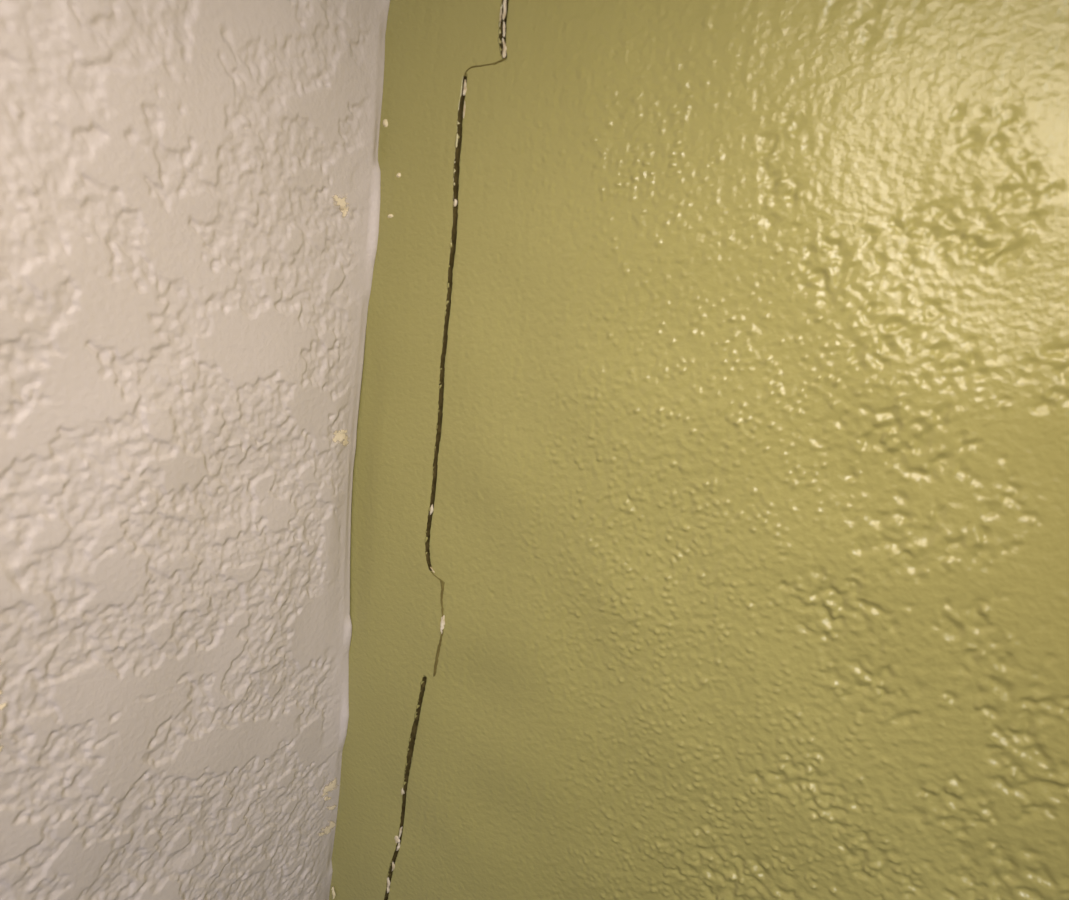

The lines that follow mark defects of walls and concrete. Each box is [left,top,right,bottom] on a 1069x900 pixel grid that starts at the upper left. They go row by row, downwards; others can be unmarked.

crack [384,0,509,900]